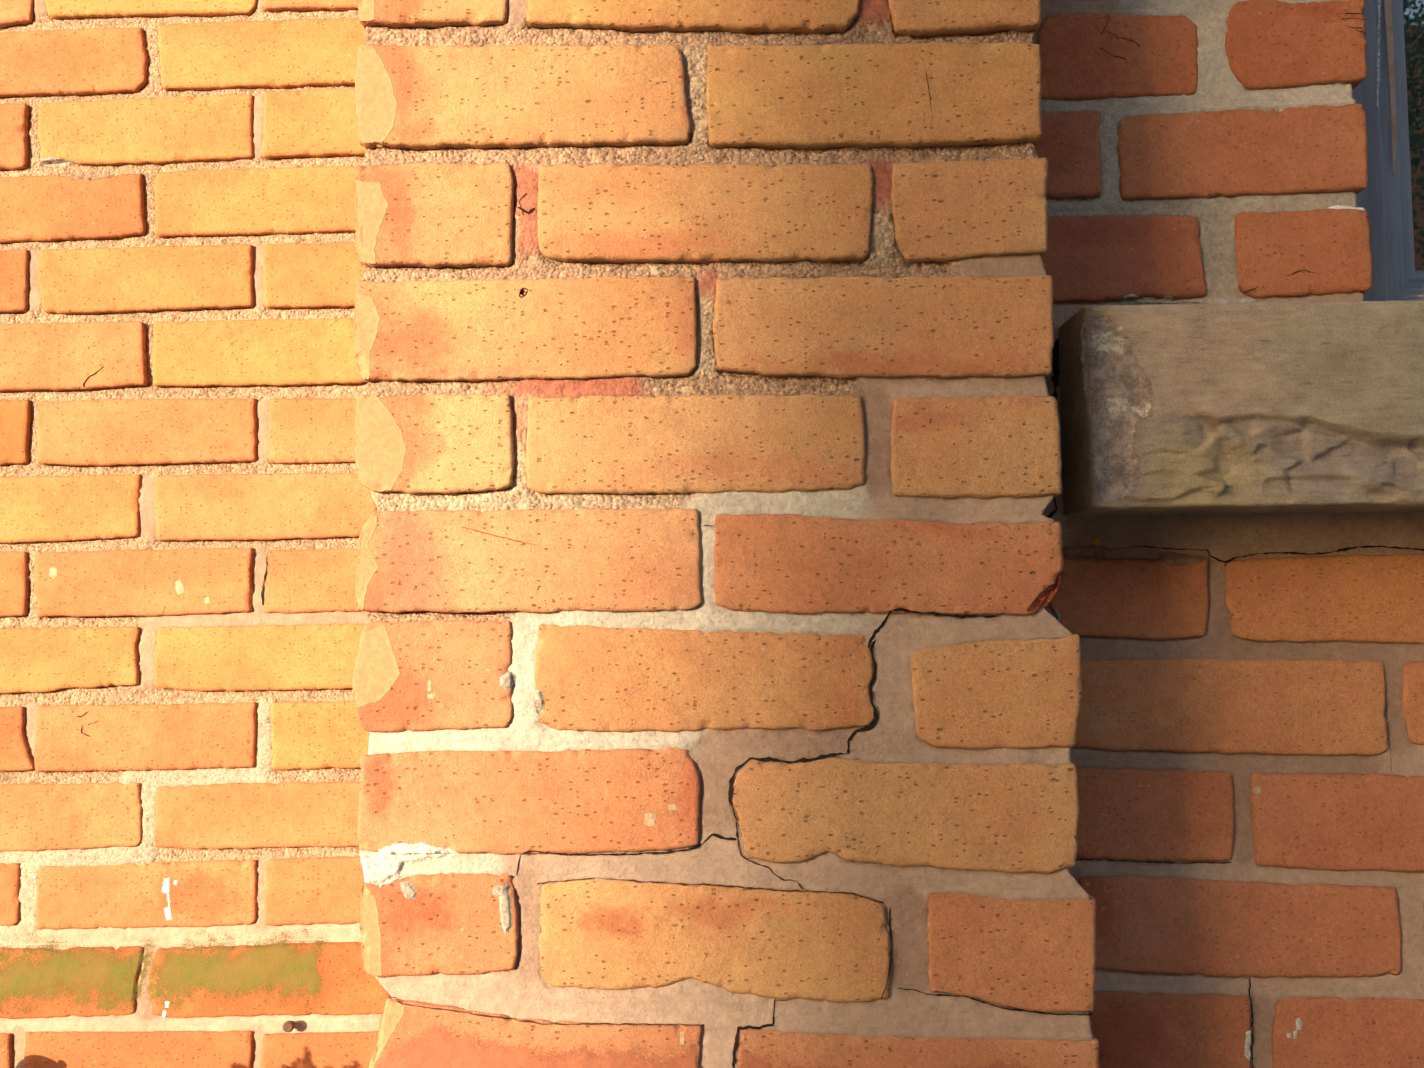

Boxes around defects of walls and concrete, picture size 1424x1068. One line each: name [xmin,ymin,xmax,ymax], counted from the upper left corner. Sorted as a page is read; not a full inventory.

crack [1051,338,1060,399]
spalling [1079,315,1155,503]
crack [1046,496,1057,518]
crack [1108,546,1424,567]
crack [516,607,1093,1016]